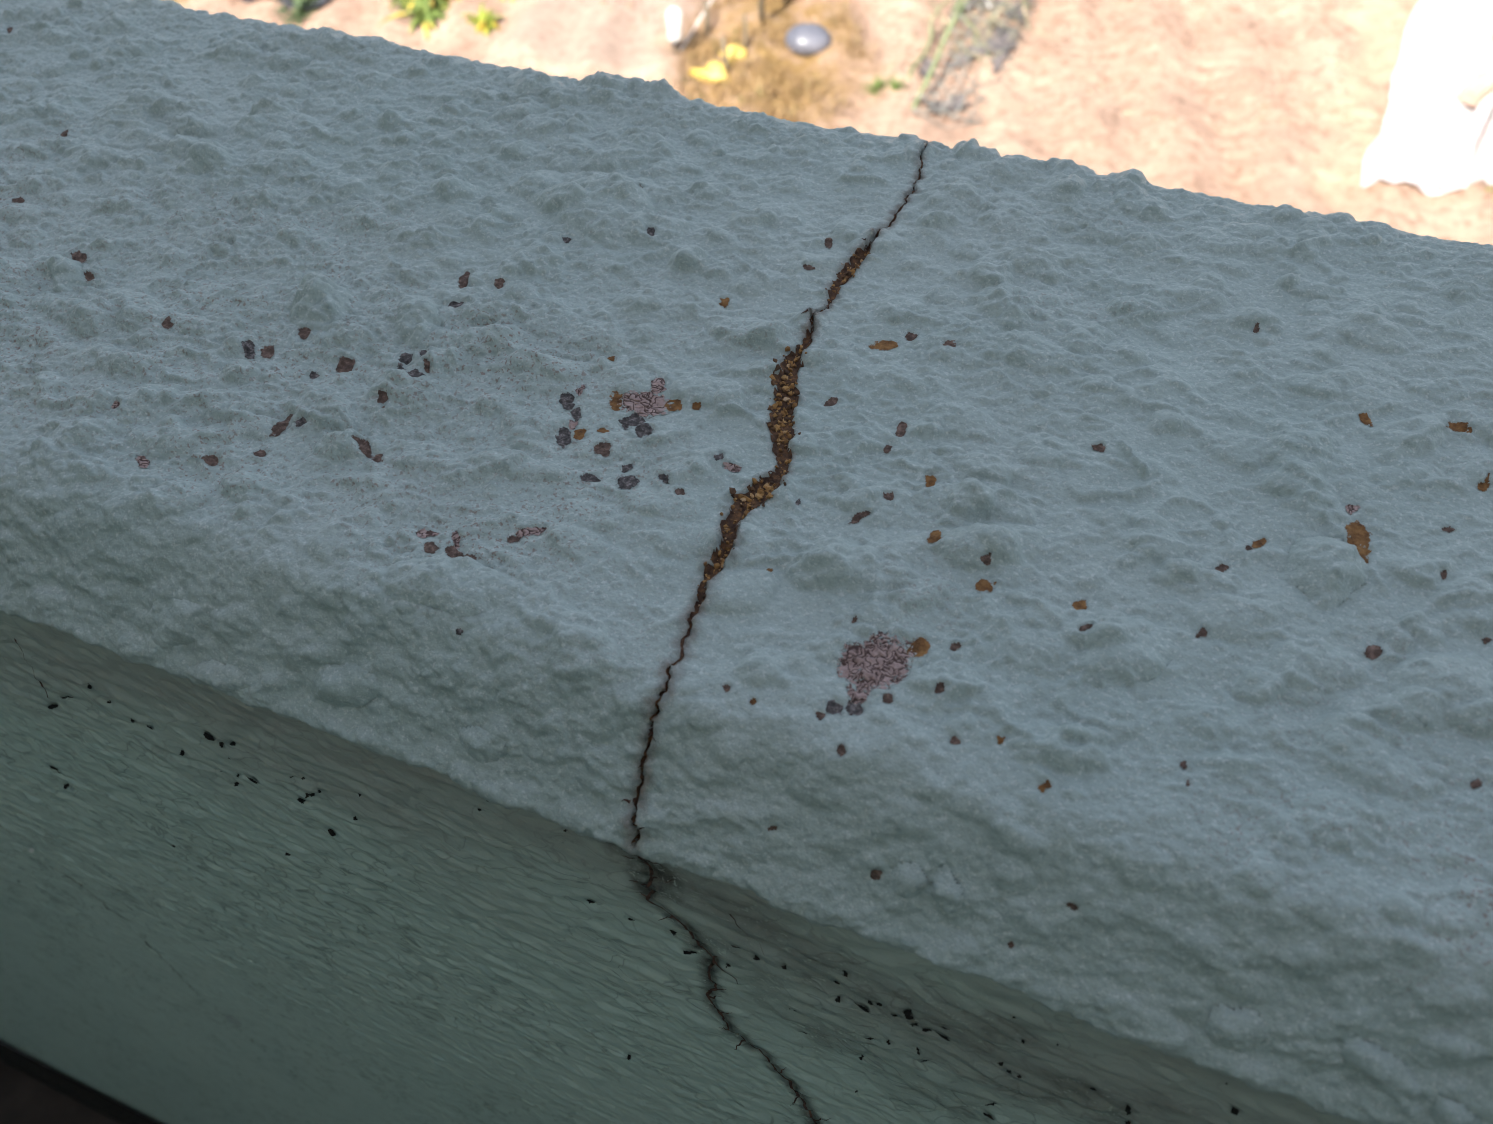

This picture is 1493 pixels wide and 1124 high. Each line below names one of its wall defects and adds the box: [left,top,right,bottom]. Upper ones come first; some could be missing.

spalling [555,377,701,490]
peeling [658,473,685,495]
peeling [713,451,742,472]
crack [622,144,927,1124]
spalling [815,616,931,720]